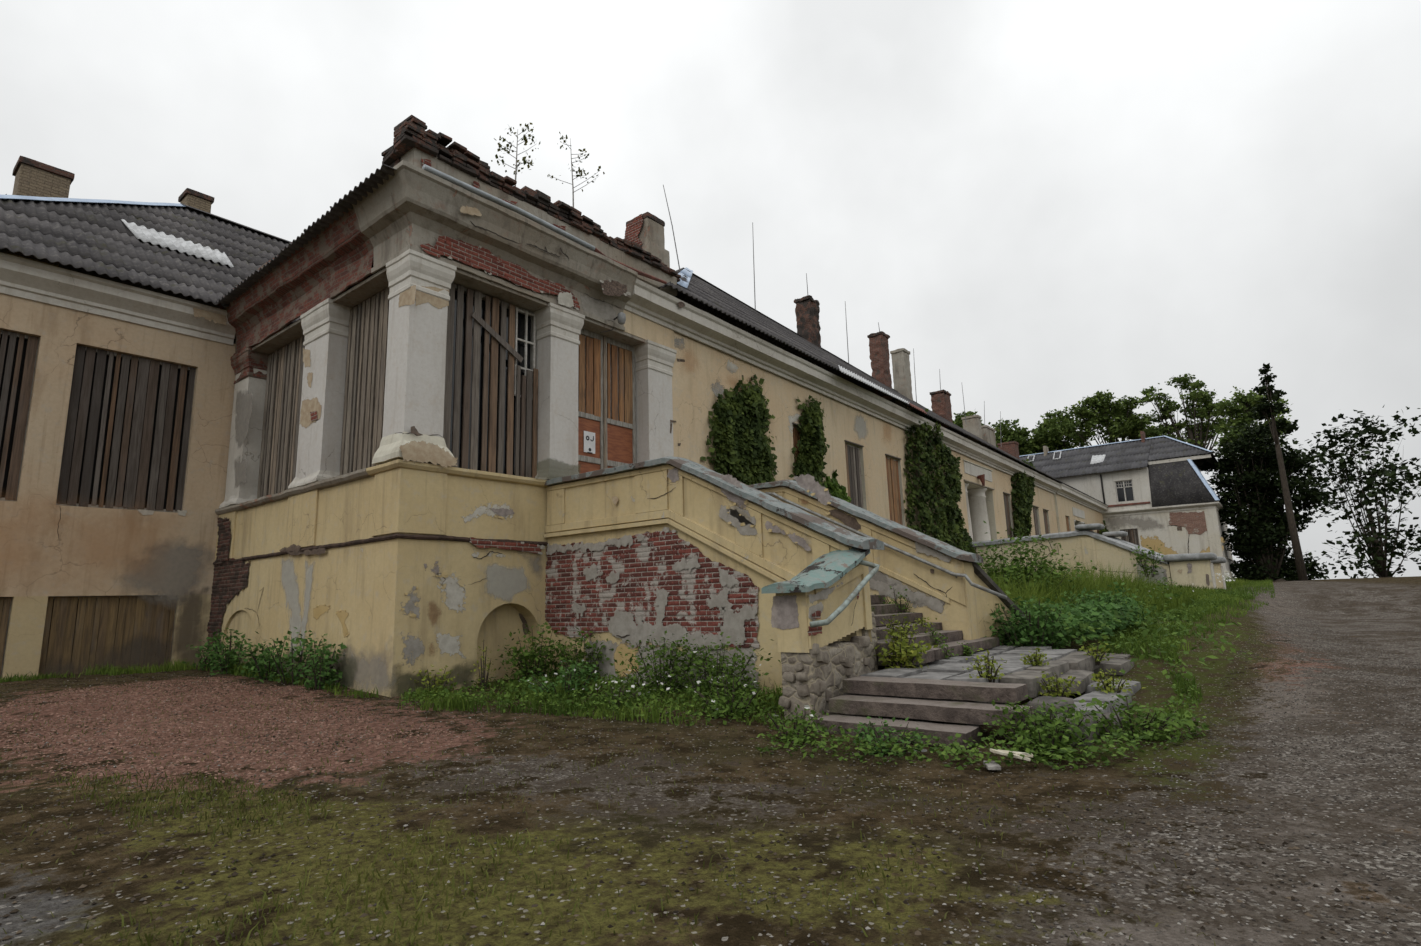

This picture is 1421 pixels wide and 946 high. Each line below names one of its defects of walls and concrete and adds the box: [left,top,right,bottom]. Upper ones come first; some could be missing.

flaking render [420,236,616,322]
flaking render [719,474,811,551]
flaking render [1138,510,1225,586]
flaking render [0,517,1022,860]